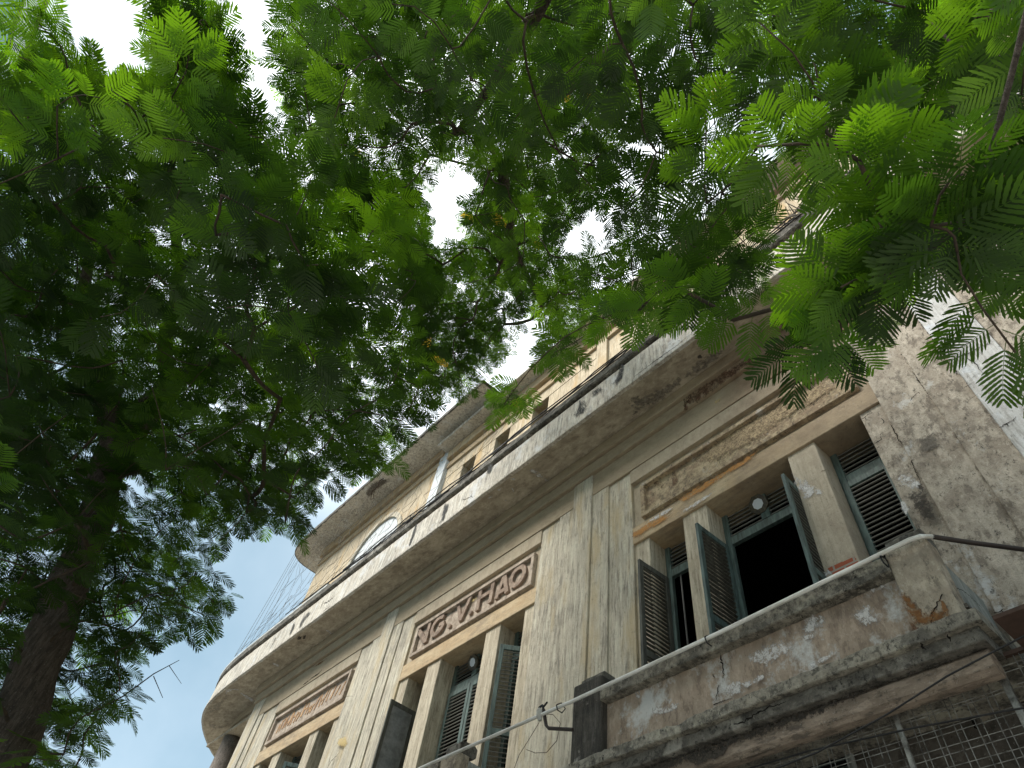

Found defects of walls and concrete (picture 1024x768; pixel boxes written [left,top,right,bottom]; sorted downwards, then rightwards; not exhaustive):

crack [860,413,921,484]
corrosion [902,593,949,631]
crack [920,588,1003,650]
crack [713,655,784,725]